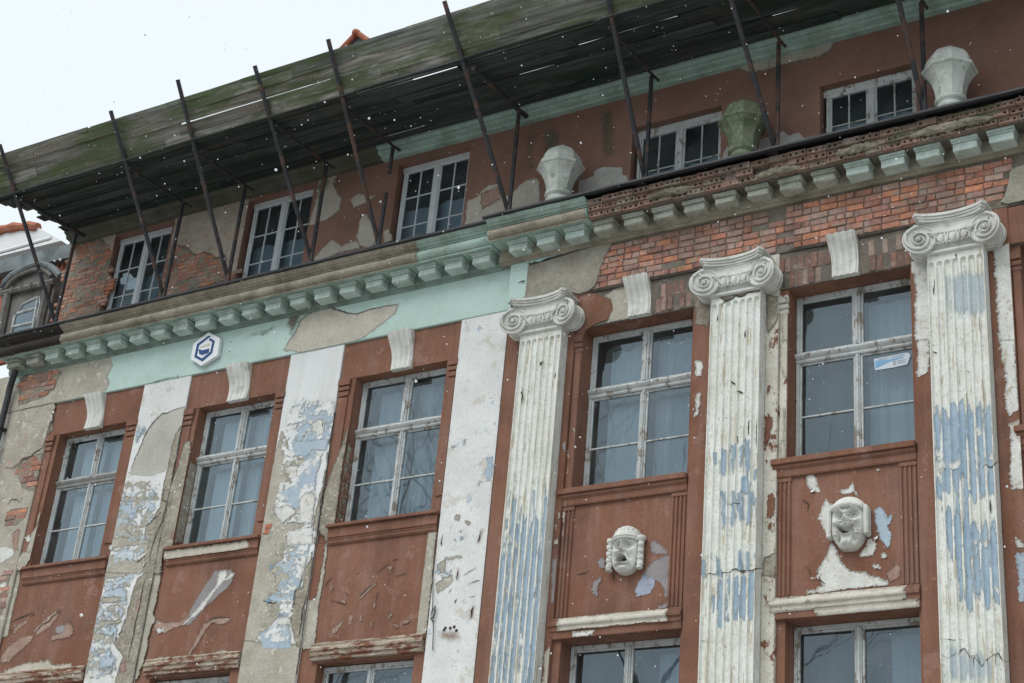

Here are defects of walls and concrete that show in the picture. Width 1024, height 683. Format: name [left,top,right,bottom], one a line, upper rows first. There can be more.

flaking render [2,176,419,358]
flaking render [523,157,1024,489]
flaking render [0,357,113,673]
spalling [85,395,405,683]
peeling [489,480,566,683]
peeling [556,539,669,637]
crack [700,567,764,575]
peeling [701,548,775,628]
peeling [769,475,920,616]
peeling [933,398,1000,612]
crack [942,638,1019,667]
peeling [1014,537,1024,602]